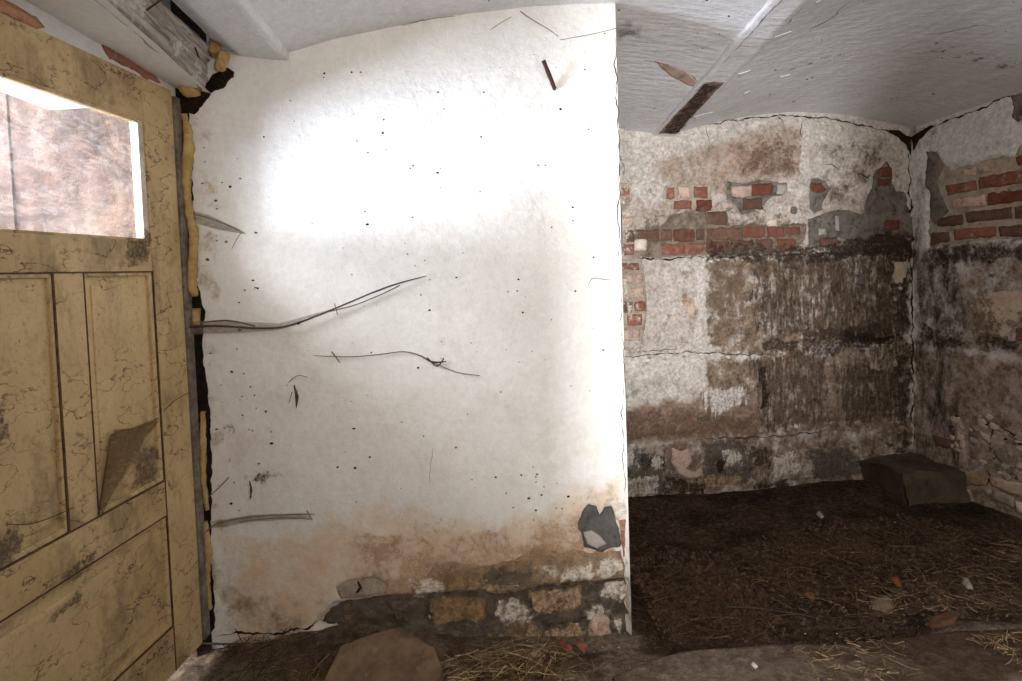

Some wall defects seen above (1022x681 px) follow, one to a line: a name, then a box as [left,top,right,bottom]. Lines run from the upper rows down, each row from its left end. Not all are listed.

spalling [1011,93,1022,122]
flaking render [925,145,1022,247]
flaking render [613,49,913,499]
crack [588,95,1013,449]
damp [626,231,1022,470]
peeling [131,447,159,489]
peeling [947,413,1022,482]
damp [363,520,620,596]
spalling [407,519,626,597]